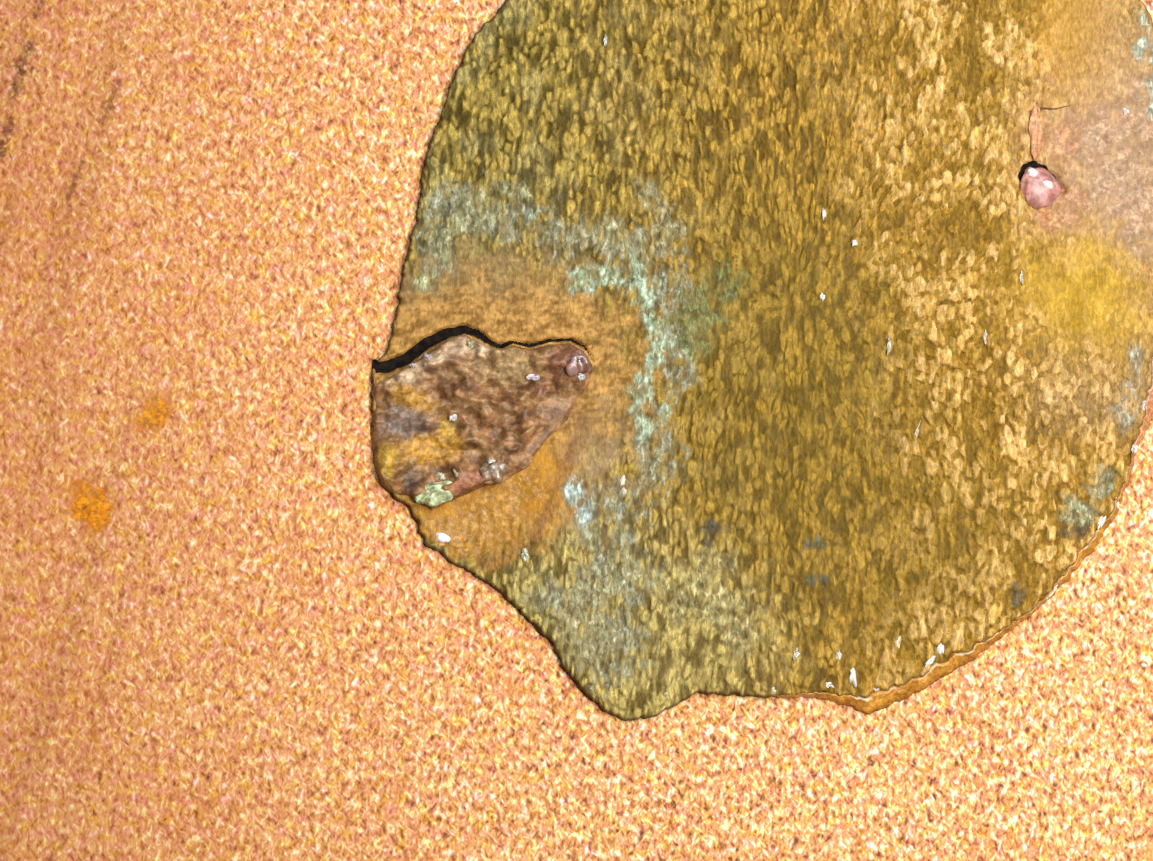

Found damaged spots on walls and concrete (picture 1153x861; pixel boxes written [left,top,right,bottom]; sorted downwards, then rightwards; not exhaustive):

peeling [1070,78,1153,261]
crack [372,325,593,374]